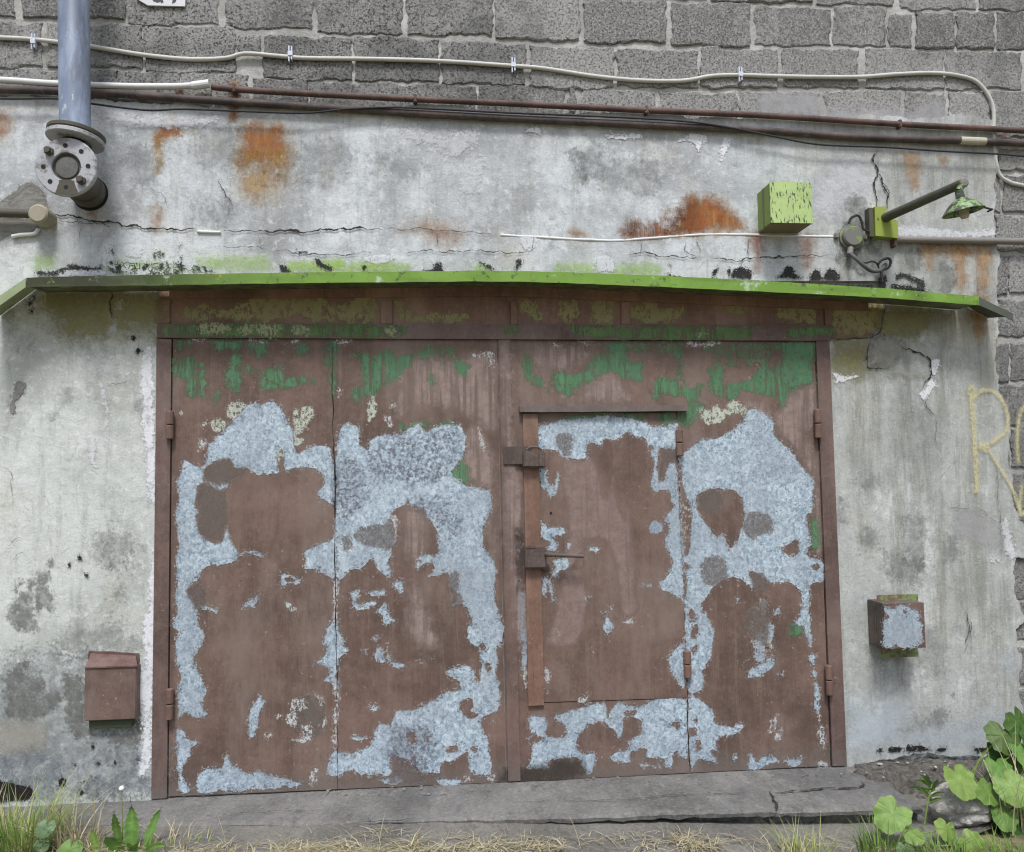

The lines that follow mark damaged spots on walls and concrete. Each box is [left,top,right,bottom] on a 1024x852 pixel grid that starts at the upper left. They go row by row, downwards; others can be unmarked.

crack [55,214,196,235]
rust [154,125,181,173]
rust [229,81,289,200]
crack [218,179,534,256]
rust [624,197,743,239]
crack [871,150,890,208]
crack [832,309,937,445]
peeling [172,399,528,795]
peeling [526,407,830,775]
leakage [0,535,154,800]